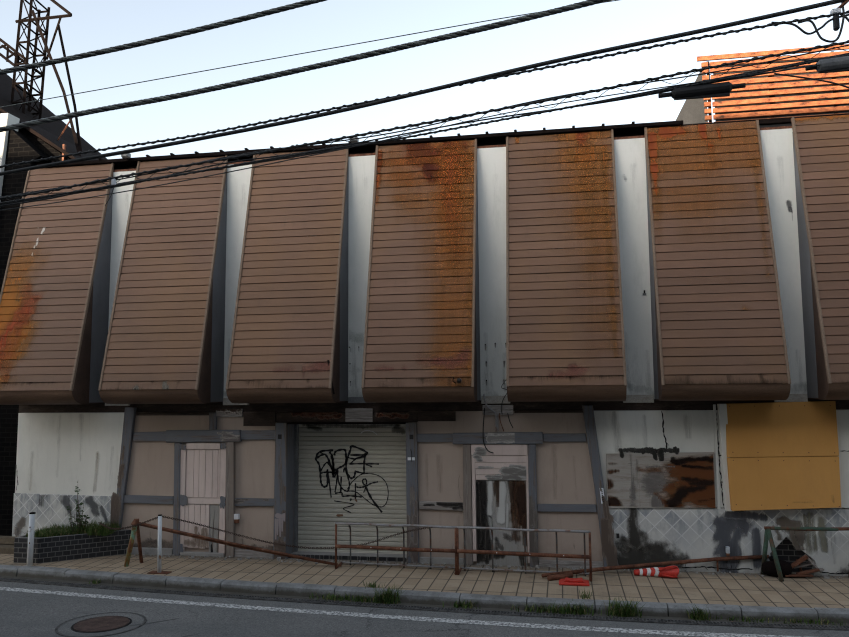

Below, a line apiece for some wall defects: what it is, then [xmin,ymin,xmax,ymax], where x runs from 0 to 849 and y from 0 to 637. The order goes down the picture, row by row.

rust [0,253,38,383]
rust [376,140,474,387]
rust [555,131,612,272]
rust [647,122,761,197]